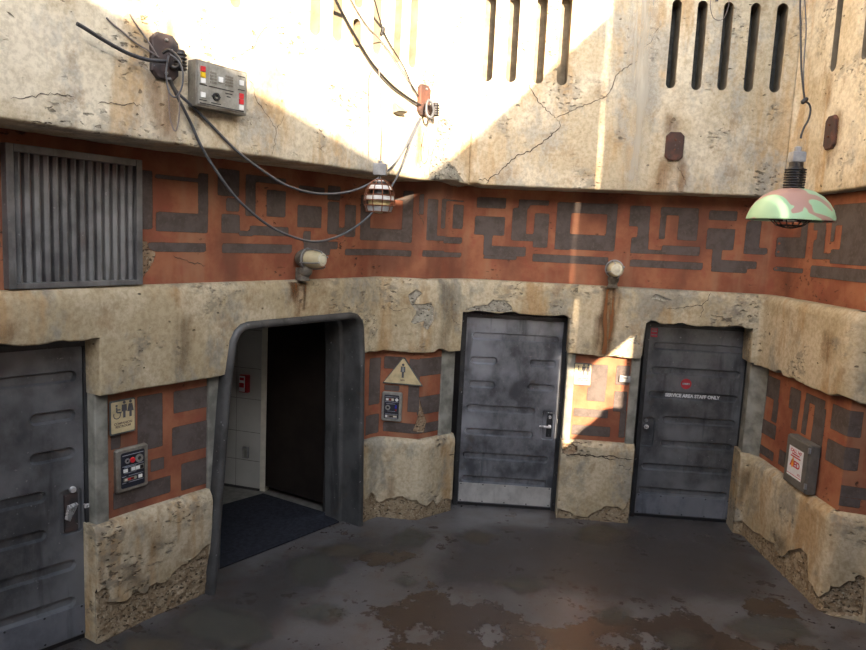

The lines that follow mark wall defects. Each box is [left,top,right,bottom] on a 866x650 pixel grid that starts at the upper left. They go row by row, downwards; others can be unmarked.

crack [479,29,658,184]
peeling [429,119,464,182]
peeling [409,290,434,330]
rust [599,288,620,355]
flaking render [363,493,451,522]
flaking render [557,498,630,523]
flaking render [95,545,209,644]
flaking render [732,521,865,616]